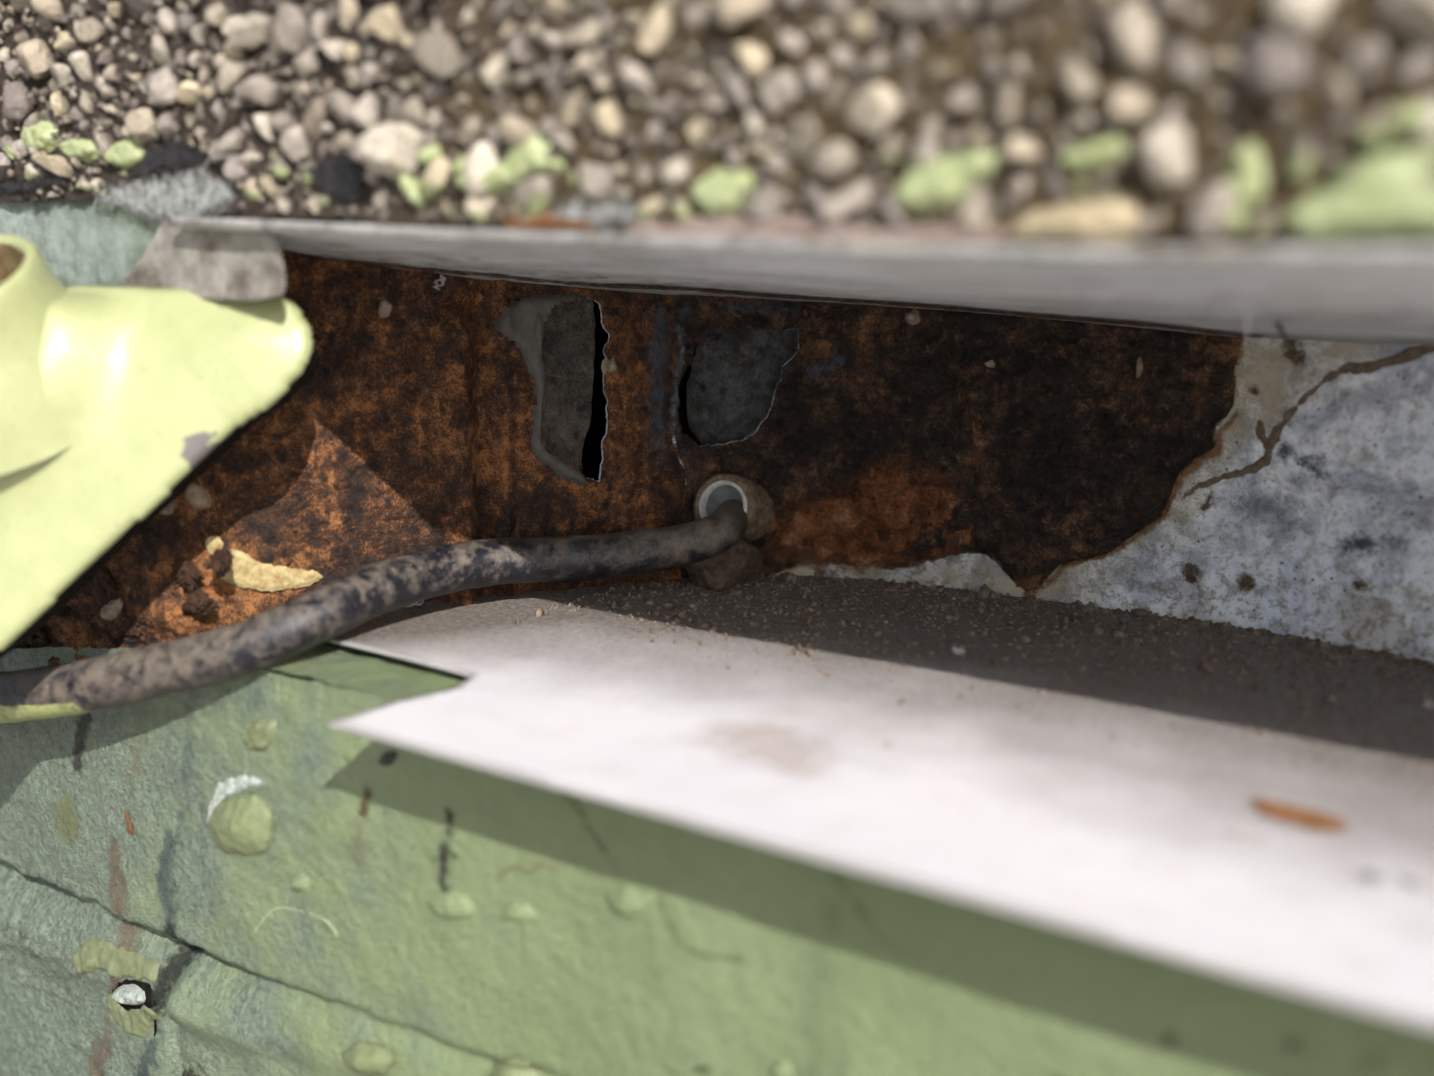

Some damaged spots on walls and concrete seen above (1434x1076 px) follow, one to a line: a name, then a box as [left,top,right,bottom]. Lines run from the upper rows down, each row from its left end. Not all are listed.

peeling [491,291,586,486]
corrosion [14,249,1369,666]
crack [1183,345,1434,498]
crack [151,919,204,1037]